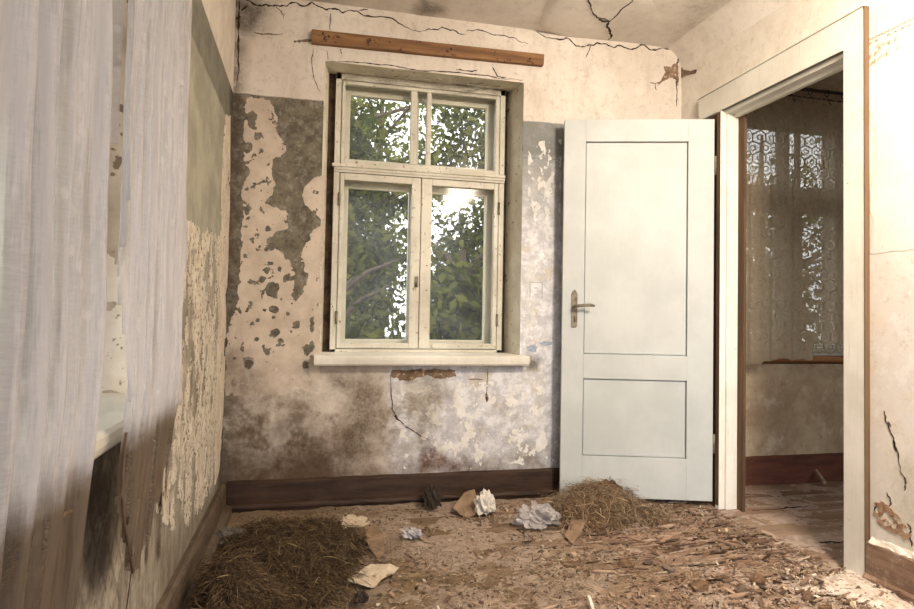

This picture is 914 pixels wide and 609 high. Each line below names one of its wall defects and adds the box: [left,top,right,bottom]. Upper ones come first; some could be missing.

crack [235,0,679,105]
spalling [658,64,697,85]
peeling [527,139,562,260]
peeling [869,73,914,254]
peeling [156,97,326,532]
crack [390,370,430,441]
peeling [391,368,559,469]
crack [874,411,907,512]
spalling [873,501,912,541]